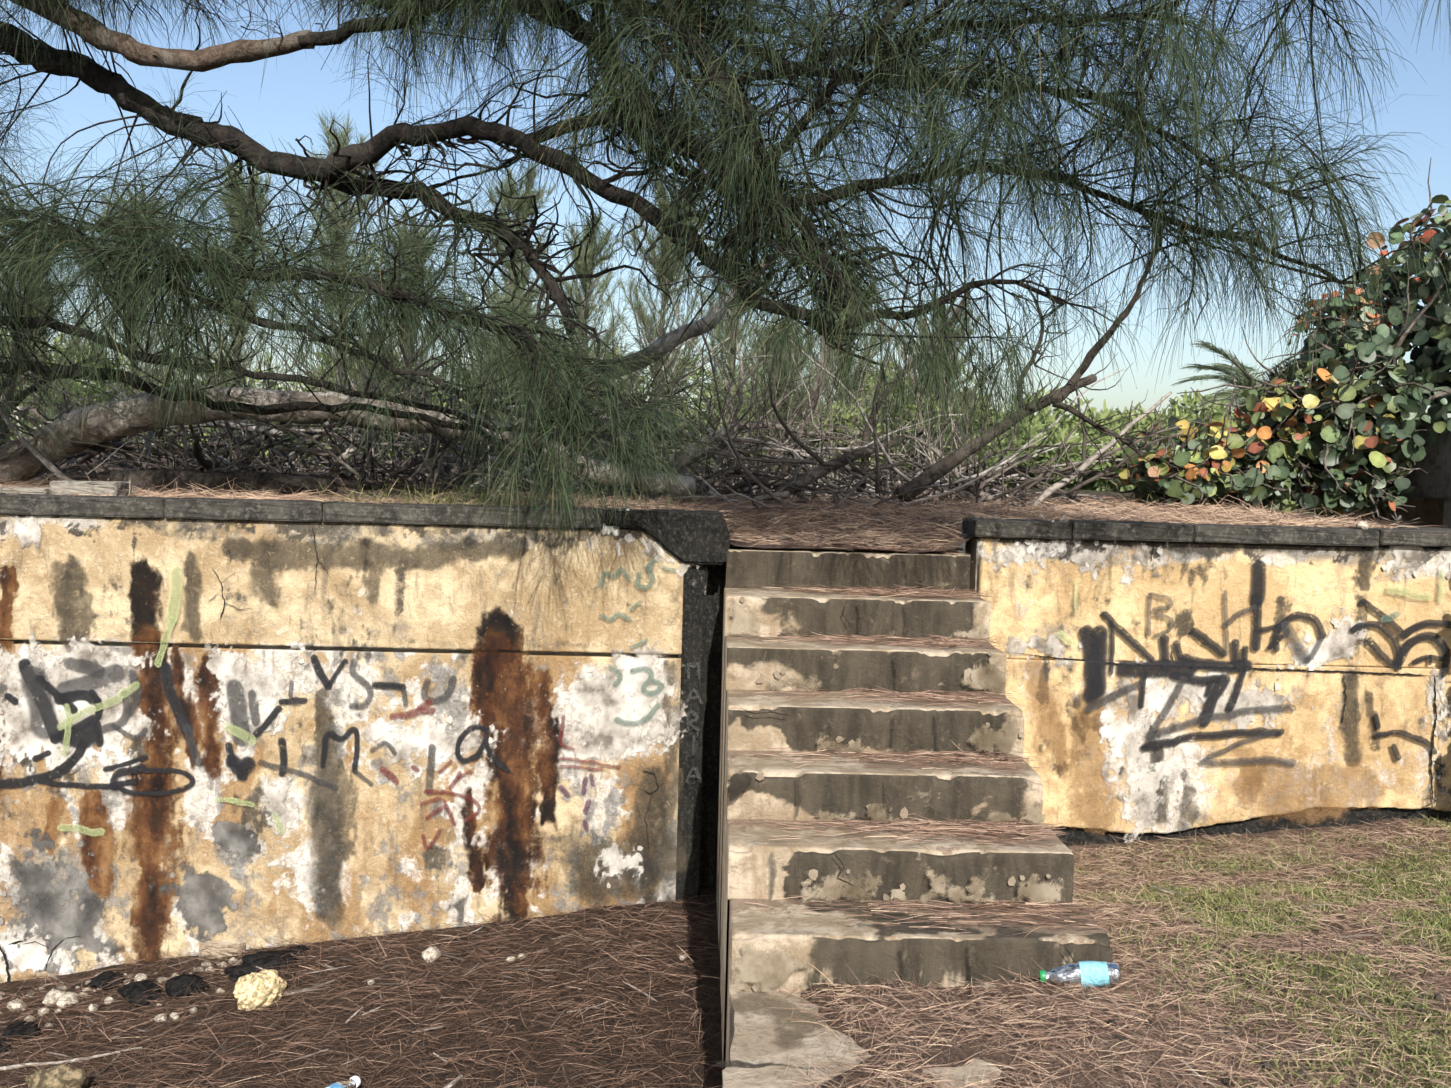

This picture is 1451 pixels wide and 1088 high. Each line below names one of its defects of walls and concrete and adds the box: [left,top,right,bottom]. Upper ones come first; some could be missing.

corrosion [0,565,19,651]
damp [52,555,96,651]
corrosion [41,558,224,963]
damp [310,689,357,925]
damp [223,533,529,607]
corrosion [461,607,561,922]
peeling [1099,606,1367,843]
damp [1341,670,1380,766]